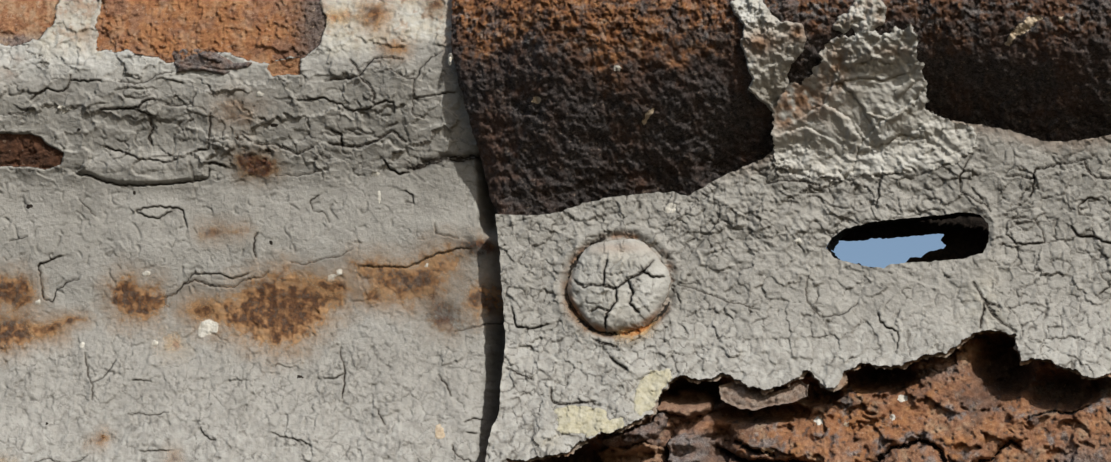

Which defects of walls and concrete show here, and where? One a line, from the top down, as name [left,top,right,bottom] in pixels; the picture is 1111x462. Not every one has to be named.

peeling [1005,15,1043,50]
peeling [730,0,980,181]
crack [78,72,226,222]
crack [258,54,479,221]
crack [959,159,1111,245]
rust [0,274,86,352]
rust [107,274,167,321]
rust [188,236,503,348]
crack [575,260,755,369]
peeling [554,405,624,437]
peeling [634,368,673,416]
peeling [719,380,809,410]